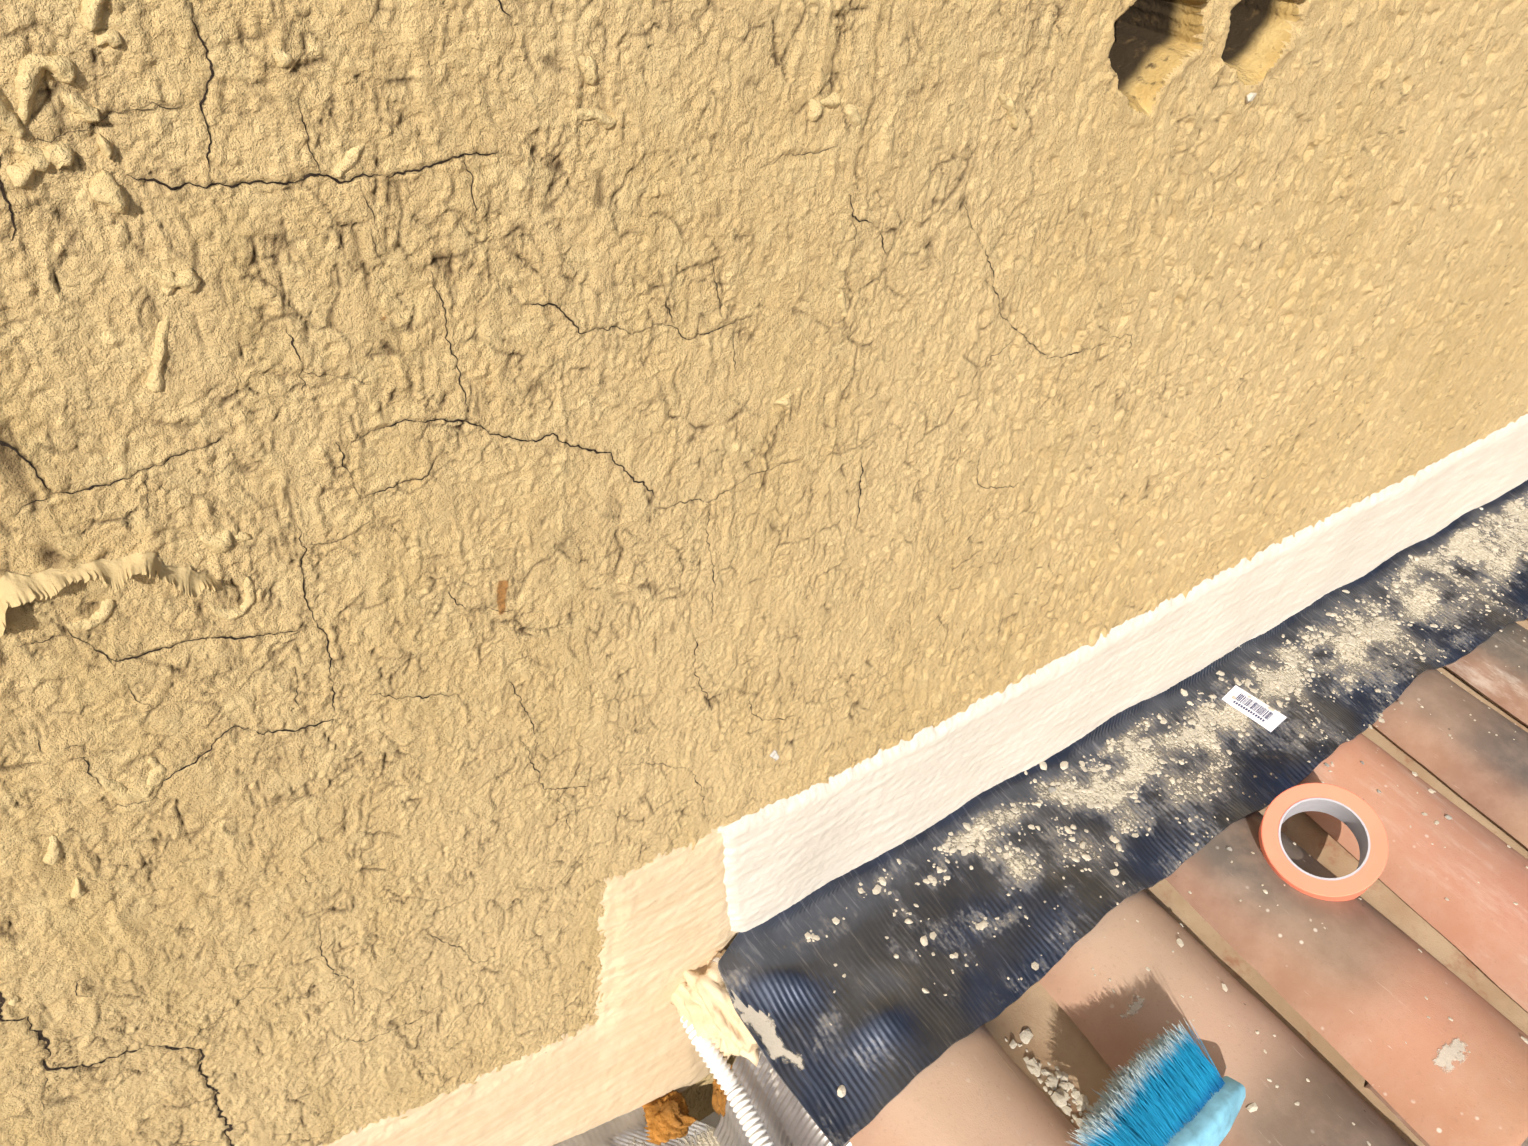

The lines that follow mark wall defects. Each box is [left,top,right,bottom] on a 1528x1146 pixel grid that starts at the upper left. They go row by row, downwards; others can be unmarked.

crack [0,156,33,241]
crack [37,0,499,262]
crack [850,195,886,253]
crack [963,195,1132,368]
peeling [0,552,223,637]
crack [0,256,800,810]
crack [856,461,864,524]
crack [510,682,586,836]
crack [318,926,440,1042]
crack [0,987,277,1146]